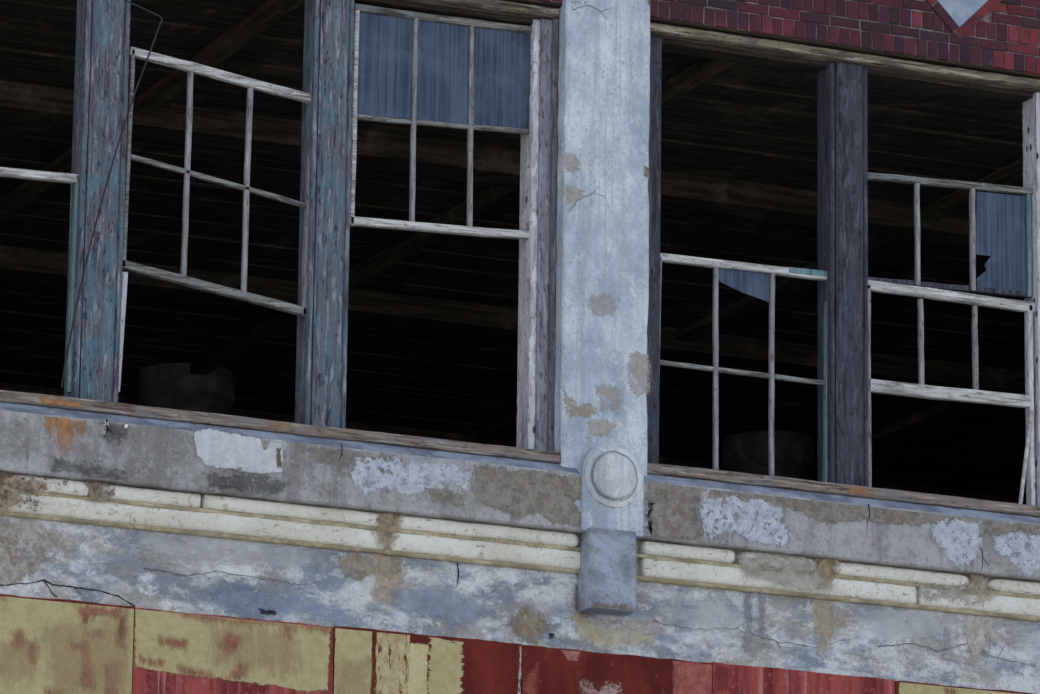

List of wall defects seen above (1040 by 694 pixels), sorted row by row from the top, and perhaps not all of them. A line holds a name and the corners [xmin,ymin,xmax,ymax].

corrosion [41,397,86,445]
peeling [561,351,651,438]
spalling [0,471,76,589]
crack [0,579,135,607]
peeling [338,456,581,581]
peeling [636,483,1040,607]